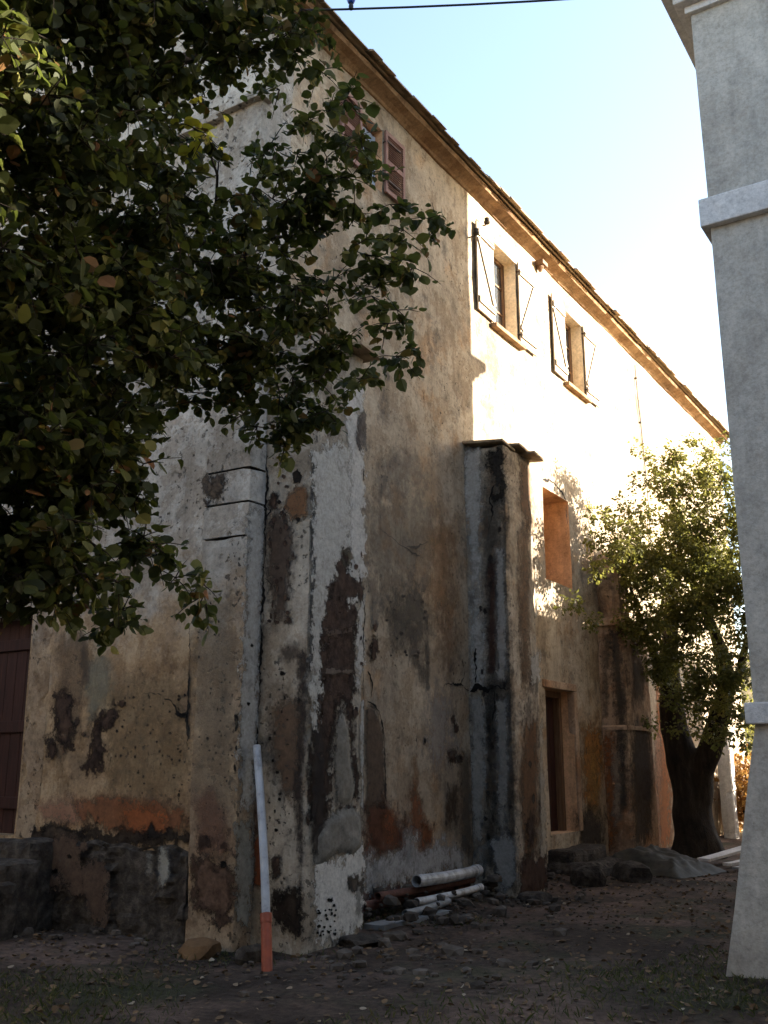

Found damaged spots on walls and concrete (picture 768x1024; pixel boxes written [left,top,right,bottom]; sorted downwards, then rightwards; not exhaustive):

rust [38,795,189,834]
water stain [148,847,169,887]
peeling [31,385,412,949]
crack [256,444,273,744]
rust [405,786,435,851]
water stain [361,457,540,898]
crack [444,648,509,719]
water stain [575,627,654,847]